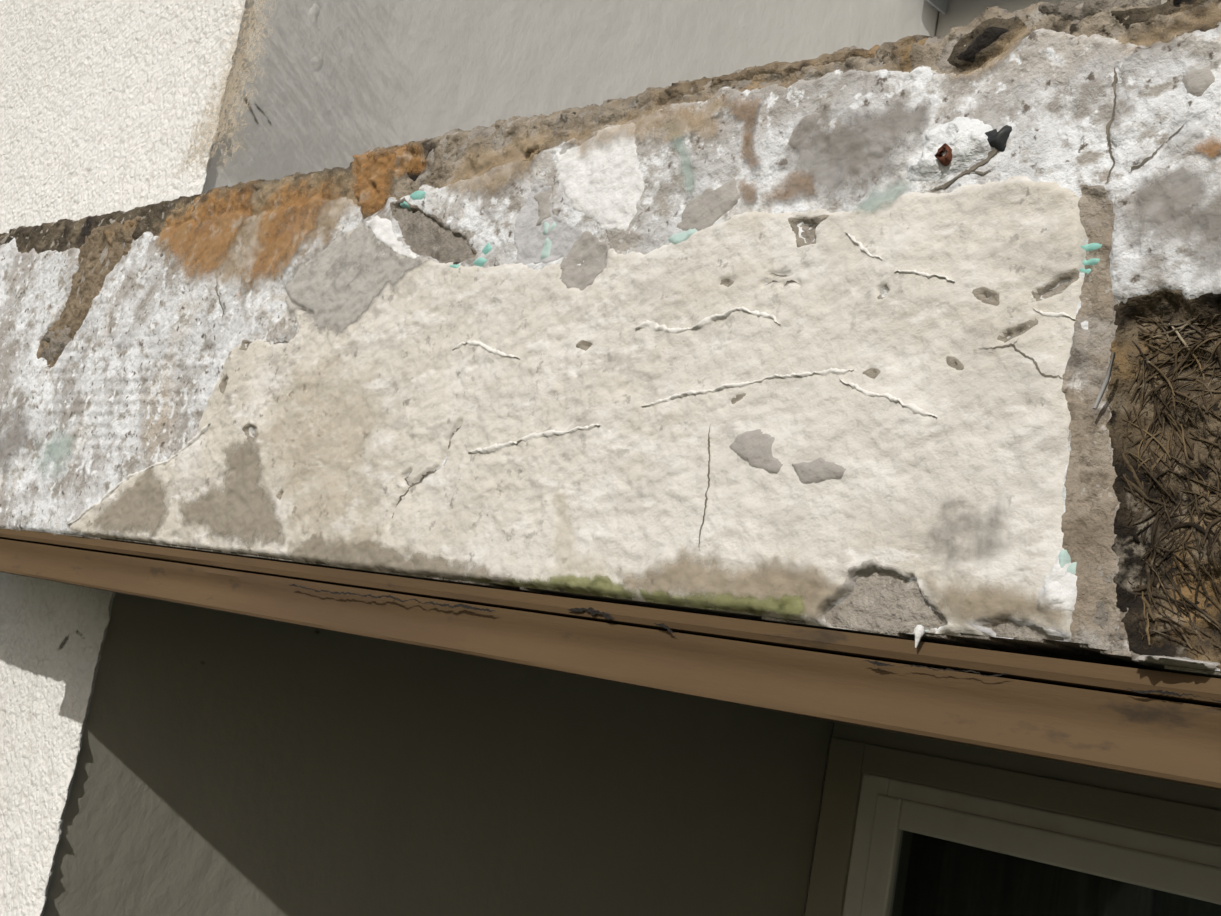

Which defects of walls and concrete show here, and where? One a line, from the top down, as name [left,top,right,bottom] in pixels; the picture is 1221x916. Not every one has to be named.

rust [353,146,424,211]
spalling [0,0,1221,370]
rust [160,183,327,274]
flaking render [219,373,229,394]
flaking render [862,368,881,379]
crack [978,341,1066,380]
flaking render [242,423,257,440]
crack [392,425,462,518]
crack [698,424,711,546]
peeling [729,429,846,484]
flaking render [815,559,912,631]